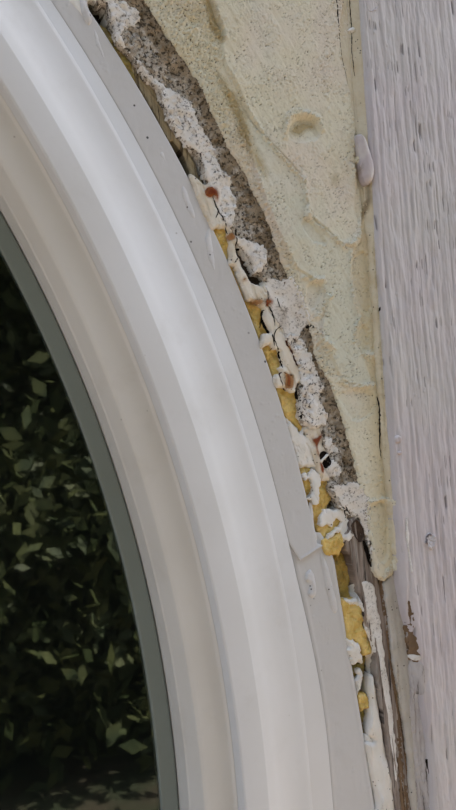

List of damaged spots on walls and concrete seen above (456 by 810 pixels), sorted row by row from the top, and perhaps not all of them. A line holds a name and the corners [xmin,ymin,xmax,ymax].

crack [336,0,355,76]
spalling [88,0,373,562]
peeling [348,581,398,781]